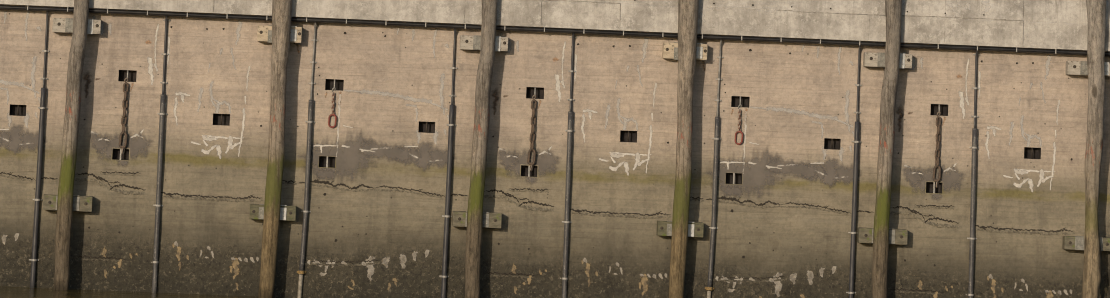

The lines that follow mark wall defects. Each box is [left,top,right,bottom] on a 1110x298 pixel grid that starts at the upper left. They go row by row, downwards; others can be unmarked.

crack [0,171,1075,235]